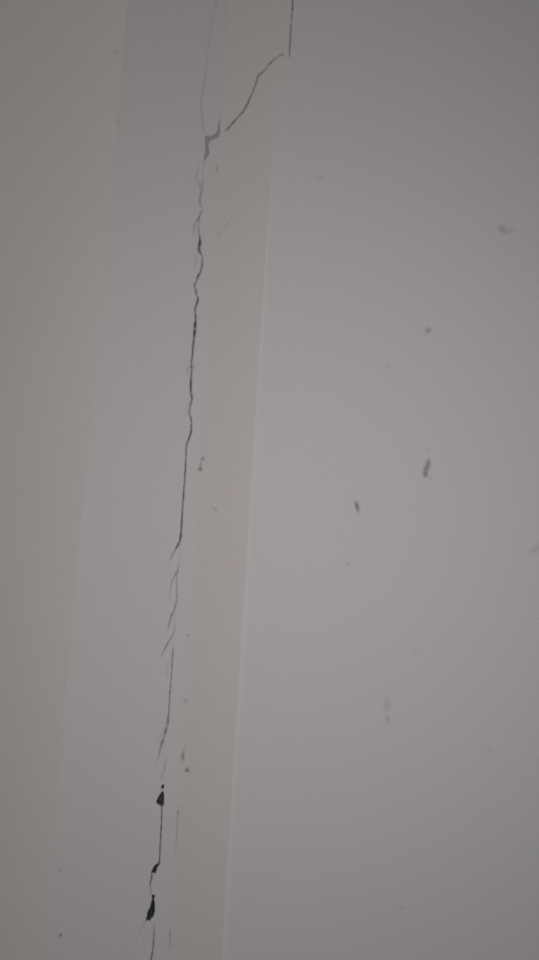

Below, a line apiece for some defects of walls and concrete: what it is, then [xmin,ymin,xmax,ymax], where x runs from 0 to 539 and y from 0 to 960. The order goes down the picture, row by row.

crack [176,237,202,548]